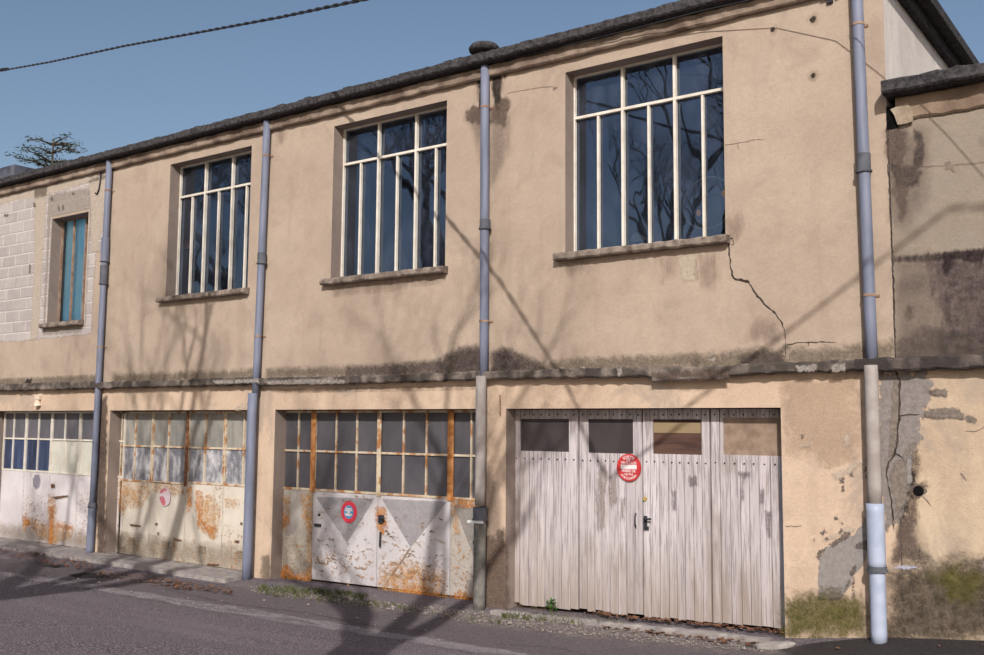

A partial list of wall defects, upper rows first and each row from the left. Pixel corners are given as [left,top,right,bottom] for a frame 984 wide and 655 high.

leakage [466,75,509,127]
leakage [887,128,924,221]
crack [918,160,984,173]
leakage [267,346,479,377]
leakage [491,346,865,371]
crack [728,237,835,357]
crack [886,116,918,529]
leakage [927,251,984,340]
spalling [924,388,976,423]
spalling [906,457,927,498]
peeling [816,517,867,601]
leakage [887,455,984,639]